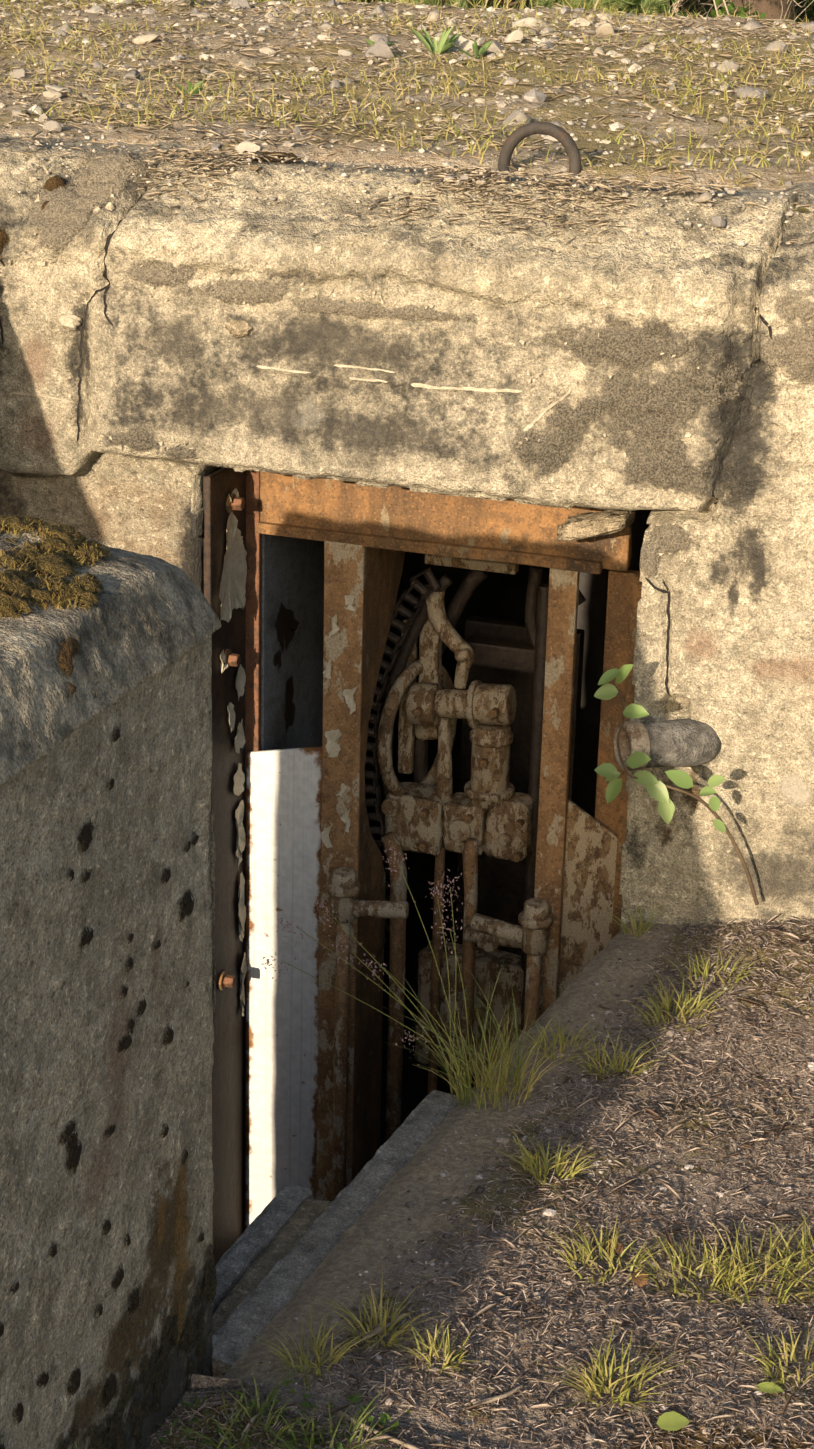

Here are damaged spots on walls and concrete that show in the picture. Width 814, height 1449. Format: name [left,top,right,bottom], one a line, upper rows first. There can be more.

crack [11,183,147,441]
crack [680,292,773,511]
peeling [219,488,247,622]
peeling [274,602,299,734]
peeling [325,729,342,757]
peeling [329,595,356,637]
peeling [342,686,358,714]
water stain [707,453,770,612]
peeling [220,649,247,1016]
peeling [321,783,351,848]
corrosion [73,1158,197,1445]